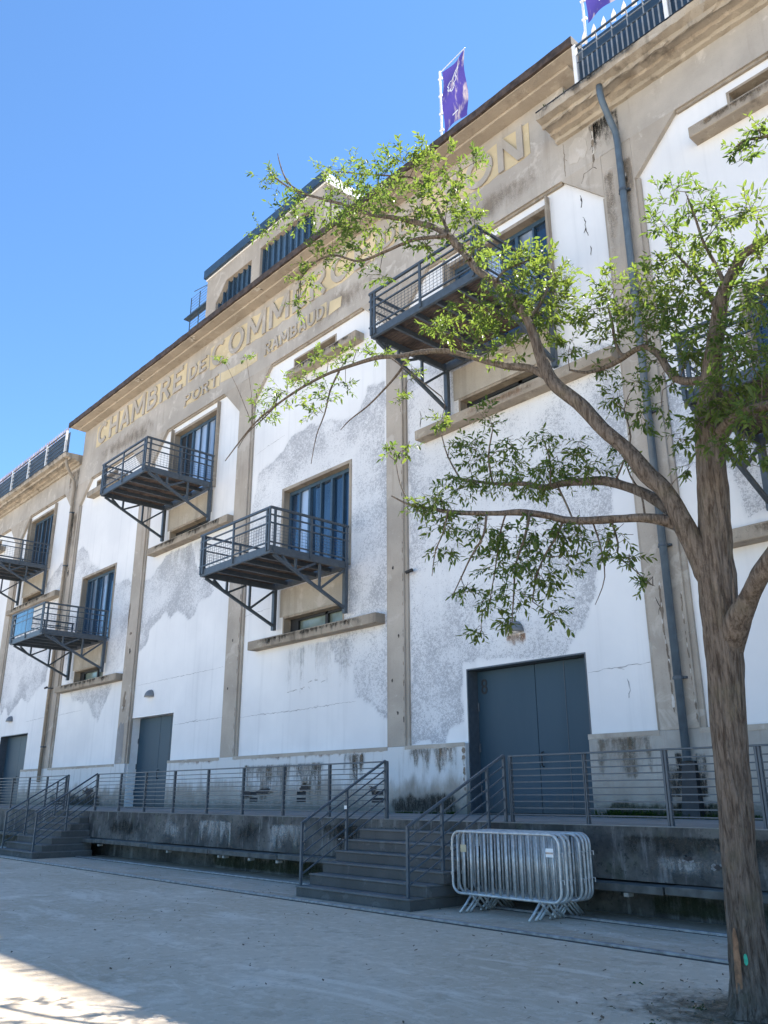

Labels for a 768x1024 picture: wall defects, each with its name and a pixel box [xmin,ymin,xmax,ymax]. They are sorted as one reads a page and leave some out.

crack [563,134,595,254]
crack [589,662,649,695]
water stain [413,748,451,768]
water stain [599,737,650,777]
mould [395,794,455,812]